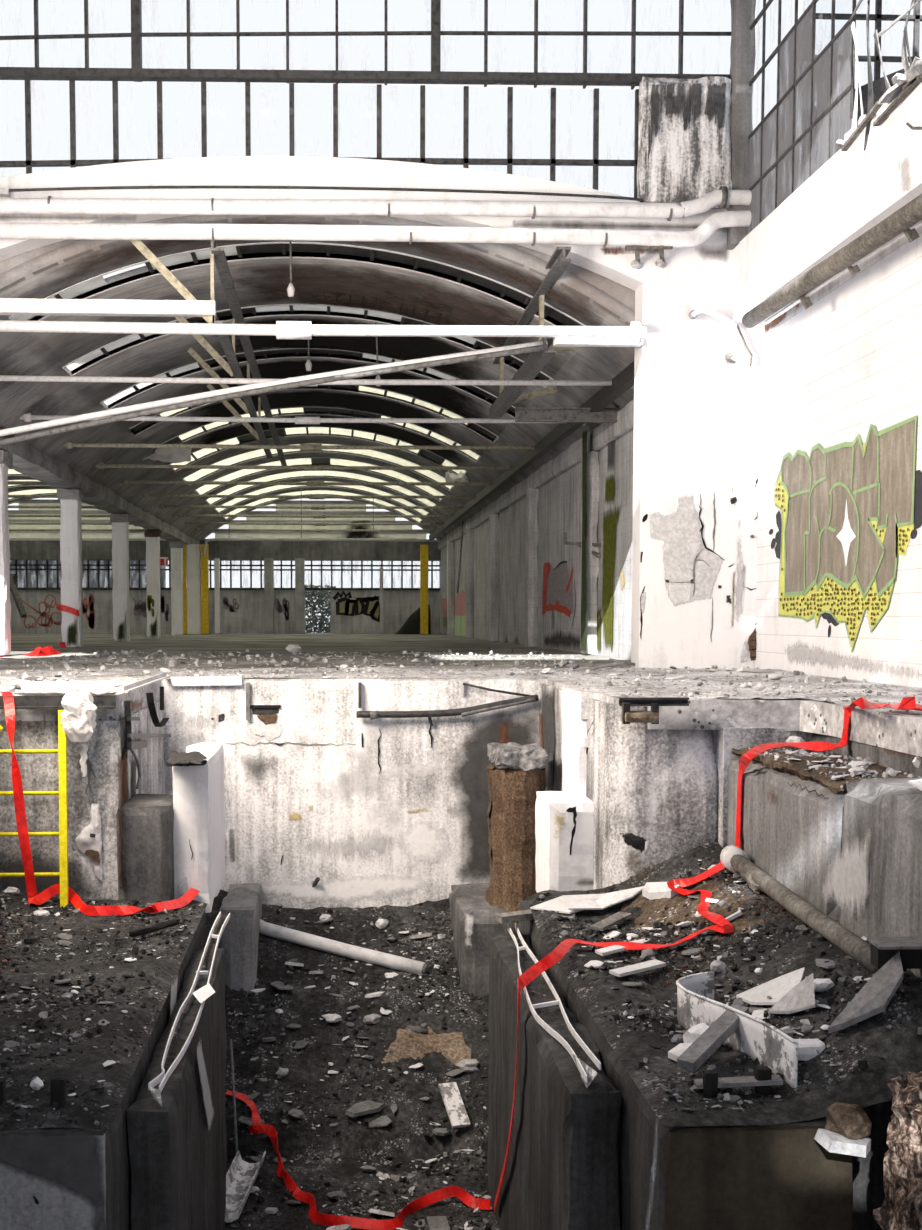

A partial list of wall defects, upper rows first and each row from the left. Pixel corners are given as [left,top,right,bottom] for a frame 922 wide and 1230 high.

damp [645,83,731,166]
spalling [649,481,731,606]
crack [640,481,756,642]
damp [453,692,555,880]